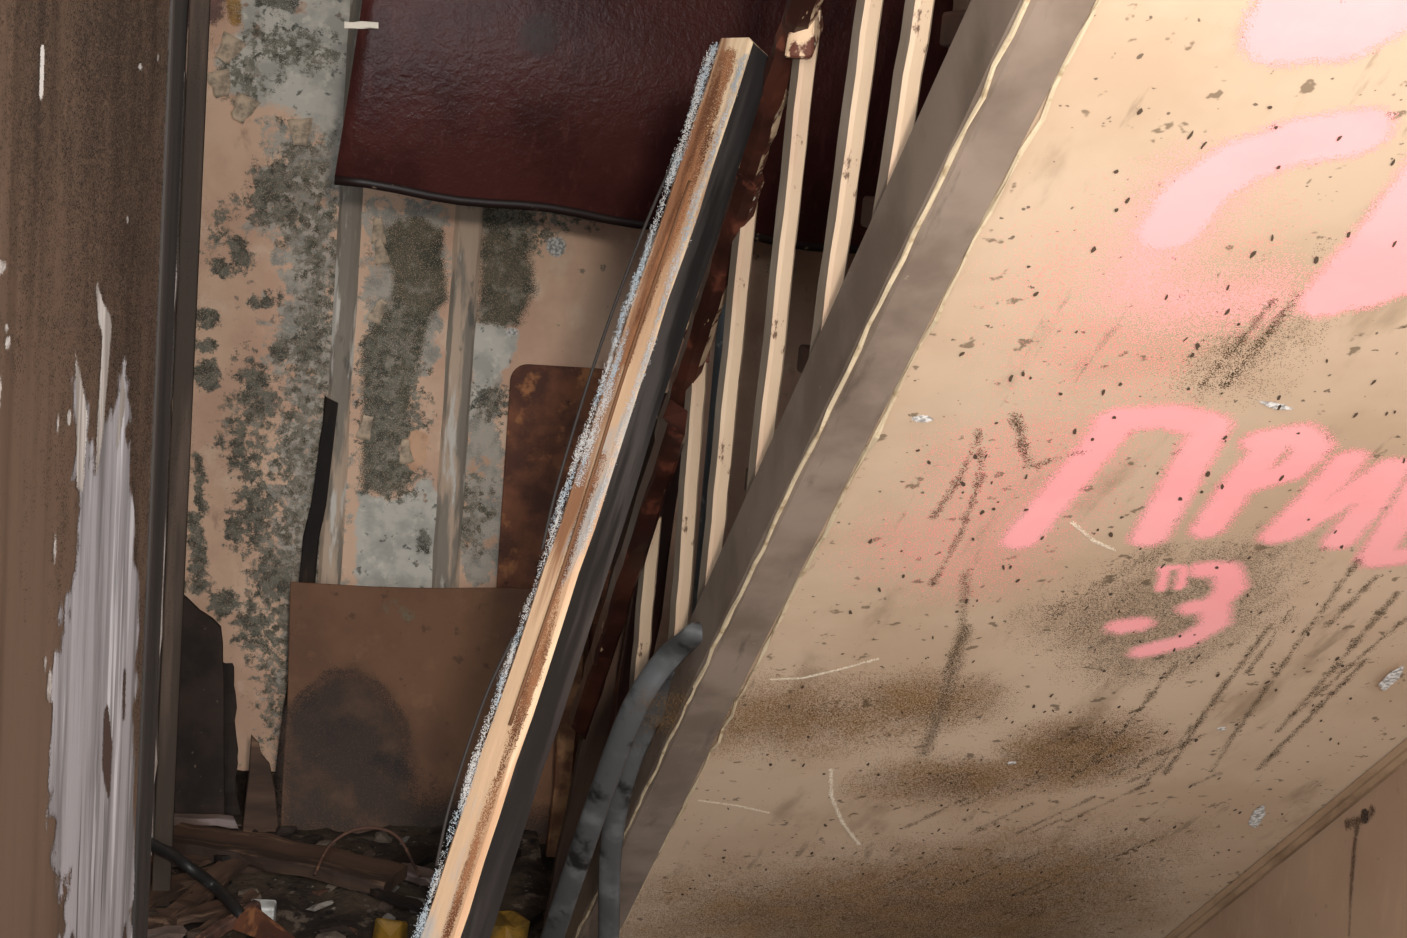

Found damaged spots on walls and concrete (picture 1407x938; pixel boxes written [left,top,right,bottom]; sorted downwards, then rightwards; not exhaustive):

peeling [43,282,141,938]
leakage [0,0,468,834]
leakage [459,362,510,588]
leakage [619,520,1383,938]
leakage [1254,591,1407,771]